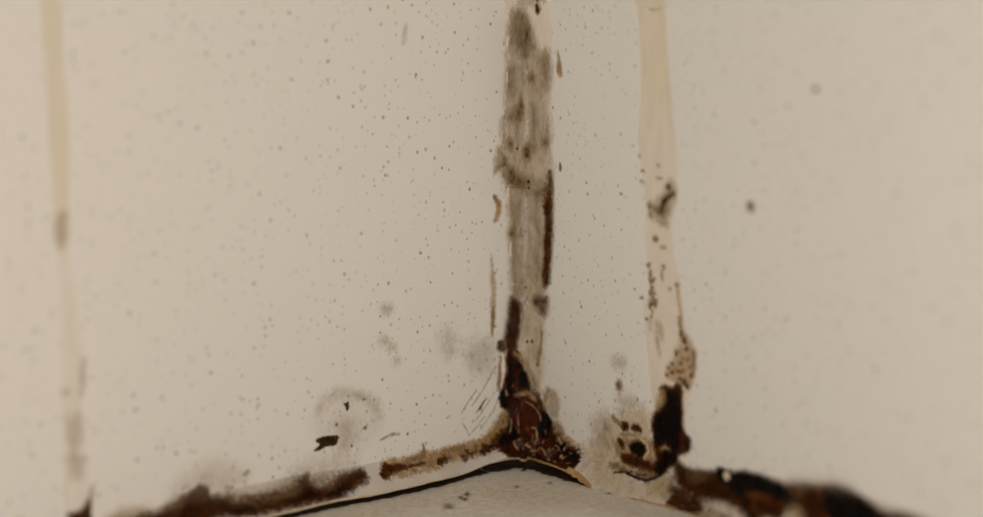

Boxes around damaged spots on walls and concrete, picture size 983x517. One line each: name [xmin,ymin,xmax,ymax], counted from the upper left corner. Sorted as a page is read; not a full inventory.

leakage [380,0,910,517]
leakage [68,488,93,517]
leakage [136,469,367,517]
peeling [566,467,592,488]